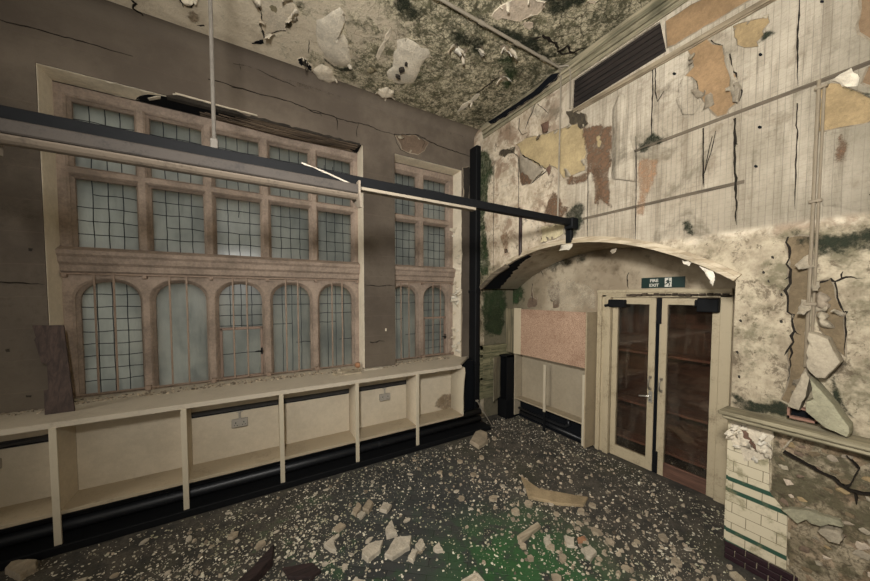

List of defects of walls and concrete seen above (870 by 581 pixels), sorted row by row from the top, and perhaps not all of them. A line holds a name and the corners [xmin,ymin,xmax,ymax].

crack [1,20,131,56]
peeling [253,0,302,39]
water stain [394,0,424,21]
peeling [448,44,486,65]
water stain [451,15,556,60]
peeling [491,0,547,29]
water stain [480,150,524,335]
water stain [814,228,870,255]
crack [783,237,800,381]
crack [819,272,858,354]
crack [783,450,870,505]
spalling [724,421,870,581]